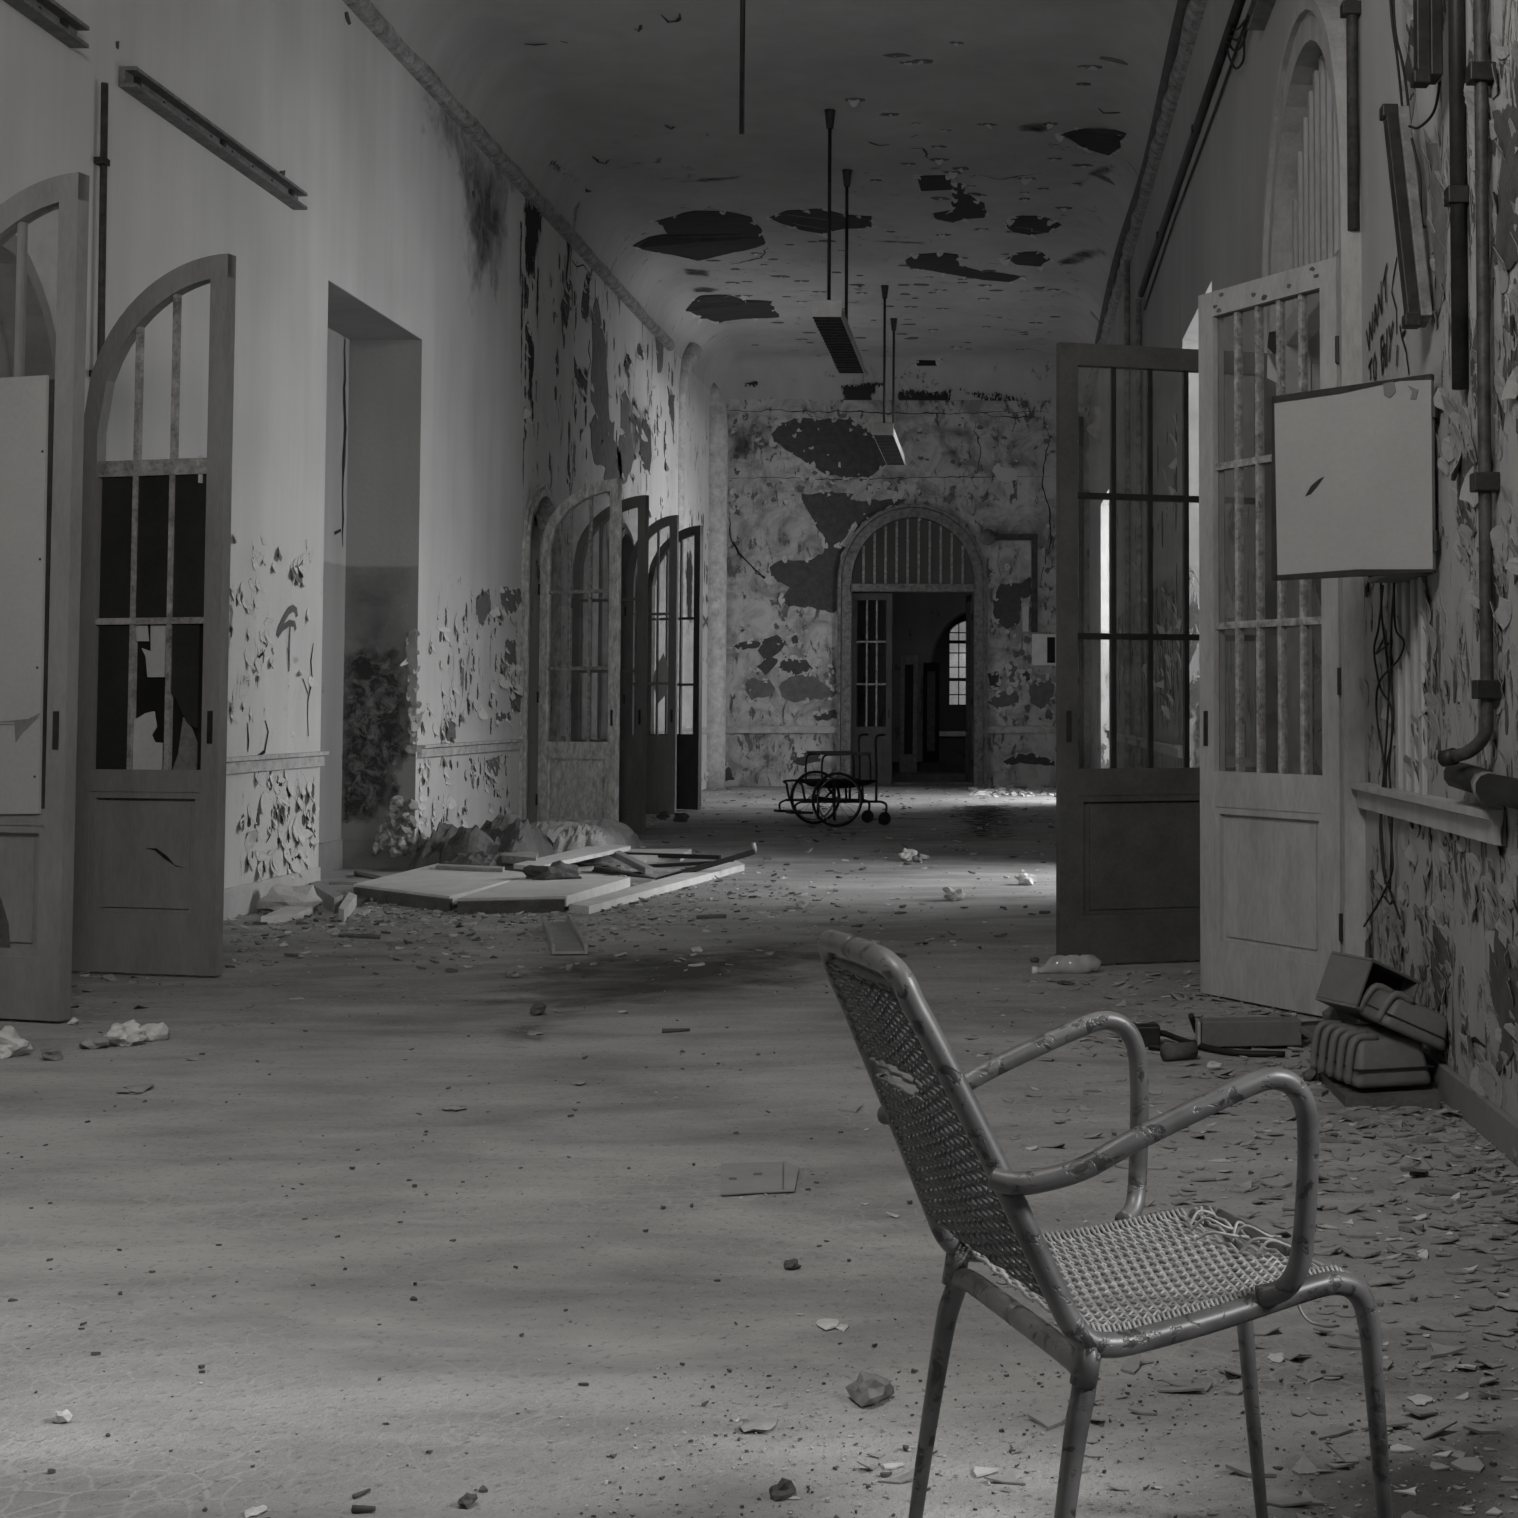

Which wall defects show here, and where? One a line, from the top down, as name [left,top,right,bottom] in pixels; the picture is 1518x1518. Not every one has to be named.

damp [462,155,501,269]
flaking render [633,207,895,325]
flaking render [855,113,1072,351]
flaking render [1043,122,1130,186]
peeling [522,253,677,514]
peeling [1359,0,1518,782]
peeling [230,536,309,682]
peeling [240,769,320,881]
peeling [400,583,524,835]
flaking render [729,415,943,723]
flaking render [988,548,1056,721]
flaking render [1003,751,1055,769]